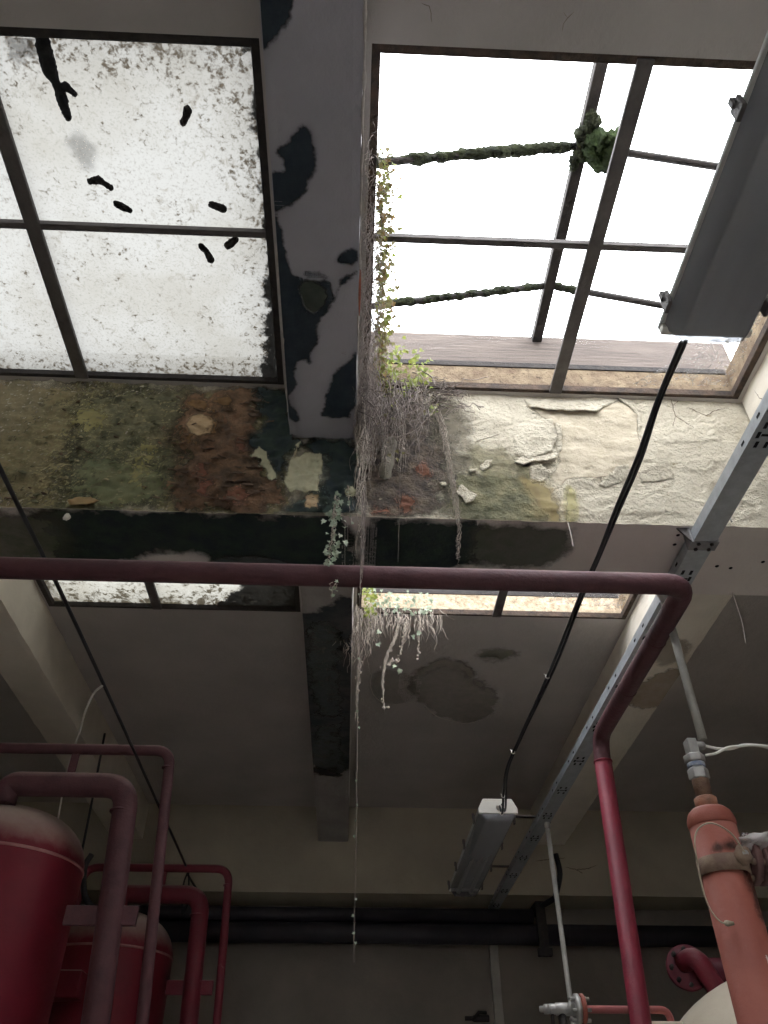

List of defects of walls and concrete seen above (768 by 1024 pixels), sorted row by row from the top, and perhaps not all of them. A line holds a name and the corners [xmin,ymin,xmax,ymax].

spalling [356,0,367,410]
leakage [0,126,558,568]
spalling [274,229,288,412]
flaking render [102,386,323,513]
peeling [440,482,477,503]
crack [671,400,725,427]
leakage [370,659,498,724]